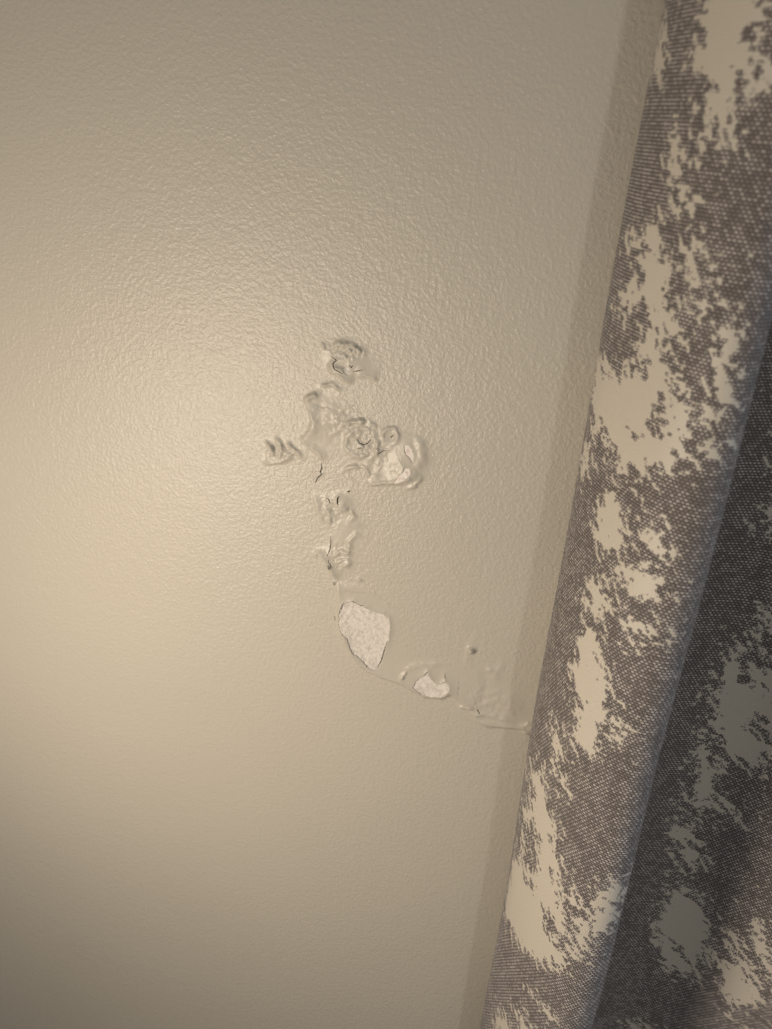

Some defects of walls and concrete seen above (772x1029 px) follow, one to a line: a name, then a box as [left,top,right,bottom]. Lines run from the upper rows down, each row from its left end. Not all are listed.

peeling [330,590,459,707]